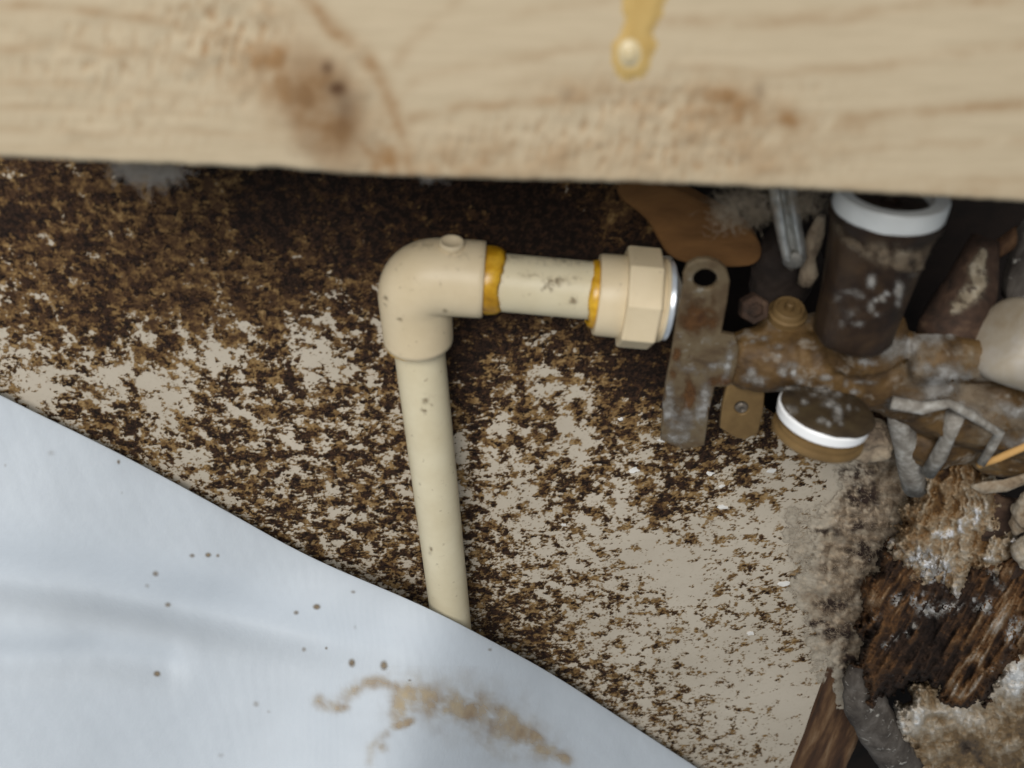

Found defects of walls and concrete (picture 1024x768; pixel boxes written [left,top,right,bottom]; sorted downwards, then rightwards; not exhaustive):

water stain [870,284,903,310]
water stain [0,157,670,609]
water stain [786,376,862,426]
water stain [445,312,827,768]
water stain [883,594,959,646]
water stain [972,598,992,614]
water stain [1006,617,1022,641]
water stain [353,679,569,763]